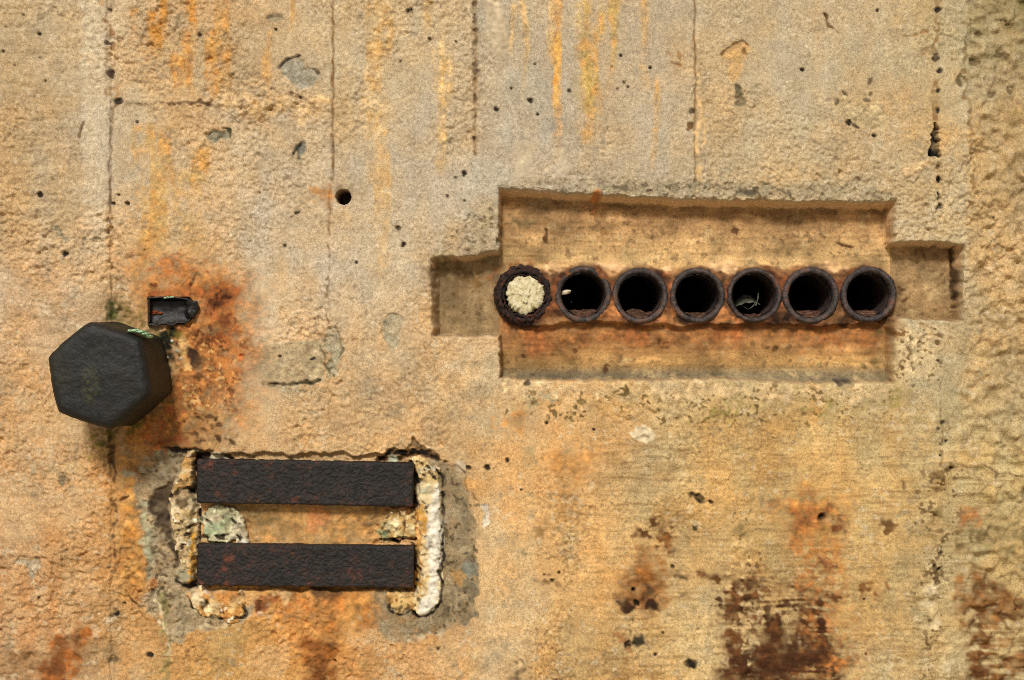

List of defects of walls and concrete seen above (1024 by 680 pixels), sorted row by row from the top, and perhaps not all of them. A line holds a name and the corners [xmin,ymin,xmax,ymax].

corrosion [544,0,622,166]
corrosion [99,121,284,604]
corrosion [482,252,909,366]
water stain [830,319,902,387]
corrosion [4,619,96,680]
spalling [146,479,180,570]
spalling [159,444,236,459]
corrosion [231,503,388,544]
spalling [373,435,491,529]
corrosion [606,509,684,676]
corrosion [692,474,877,680]
corrosion [937,499,1024,680]